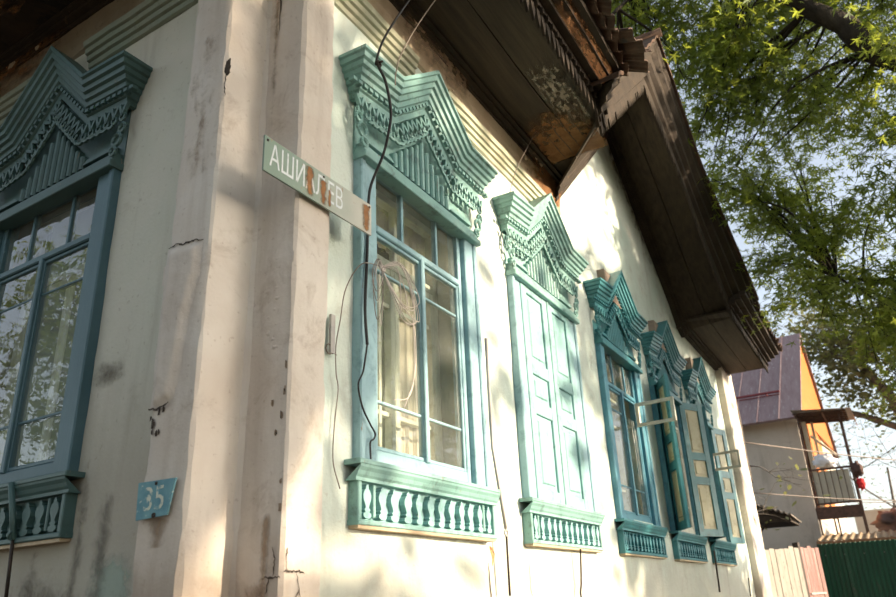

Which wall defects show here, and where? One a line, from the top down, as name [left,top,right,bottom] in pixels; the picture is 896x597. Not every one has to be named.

peeling [532,66,589,119]
crack [263,547,305,597]